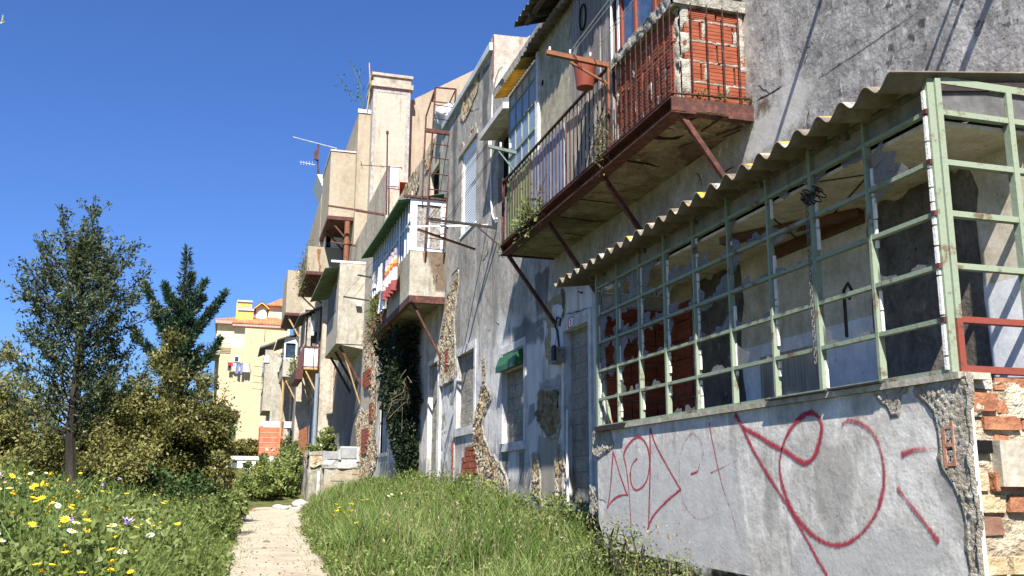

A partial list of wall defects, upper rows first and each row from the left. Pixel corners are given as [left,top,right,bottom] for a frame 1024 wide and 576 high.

flaking render [459,74,479,153]
crack [546,128,702,246]
flaking render [355,335,378,480]
flaking render [437,269,510,499]
flaking render [528,386,567,520]
flaking render [874,371,985,576]